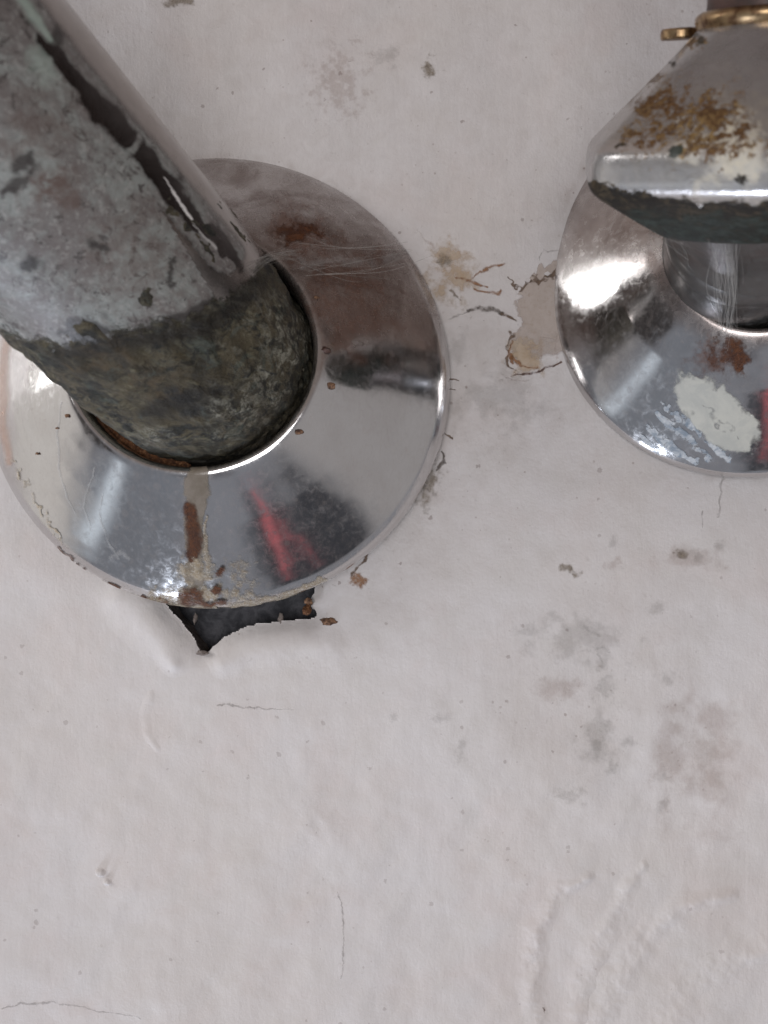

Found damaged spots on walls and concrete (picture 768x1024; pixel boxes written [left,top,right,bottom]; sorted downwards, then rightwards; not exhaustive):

crack [467,307,516,321]
peeling [505,261,562,369]
flaking render [166,587,338,656]